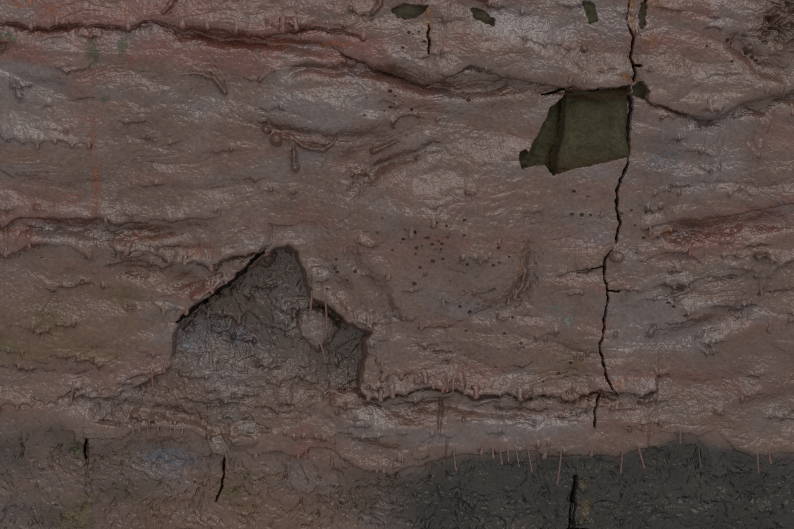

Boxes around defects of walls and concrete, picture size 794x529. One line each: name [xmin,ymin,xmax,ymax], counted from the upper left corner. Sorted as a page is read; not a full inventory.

spalling [392,4,426,19]
spalling [470,8,494,26]
spalling [582,1,597,24]
spalling [519,82,647,175]
crack [541,0,646,376]
crack [176,251,265,322]